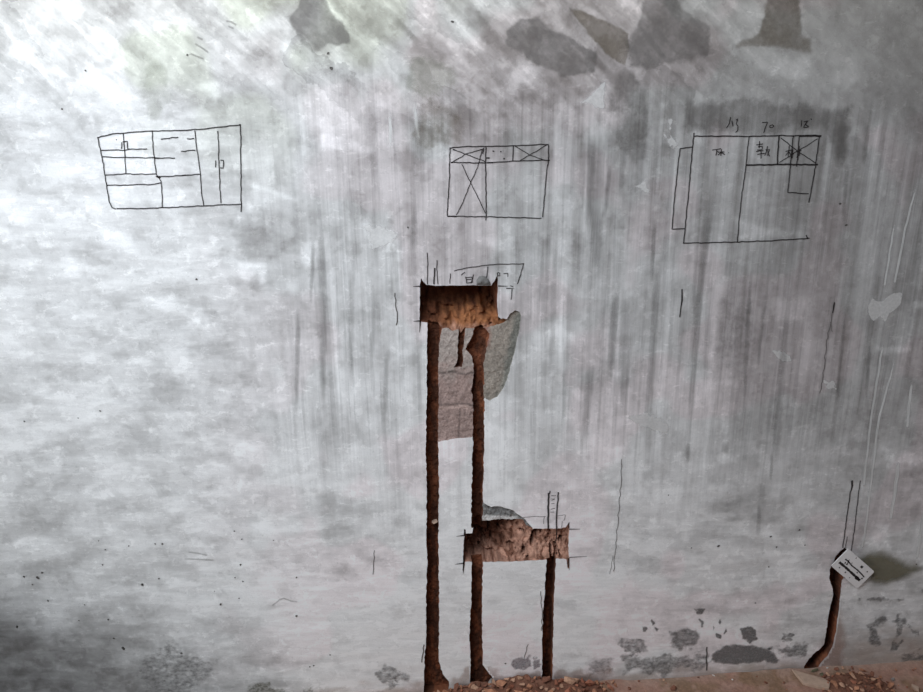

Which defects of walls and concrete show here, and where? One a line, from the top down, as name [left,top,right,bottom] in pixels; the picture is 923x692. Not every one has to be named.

water stain [884,193,915,286]
spalling [419,276,521,442]
spalling [462,503,569,571]
water stain [861,350,918,583]